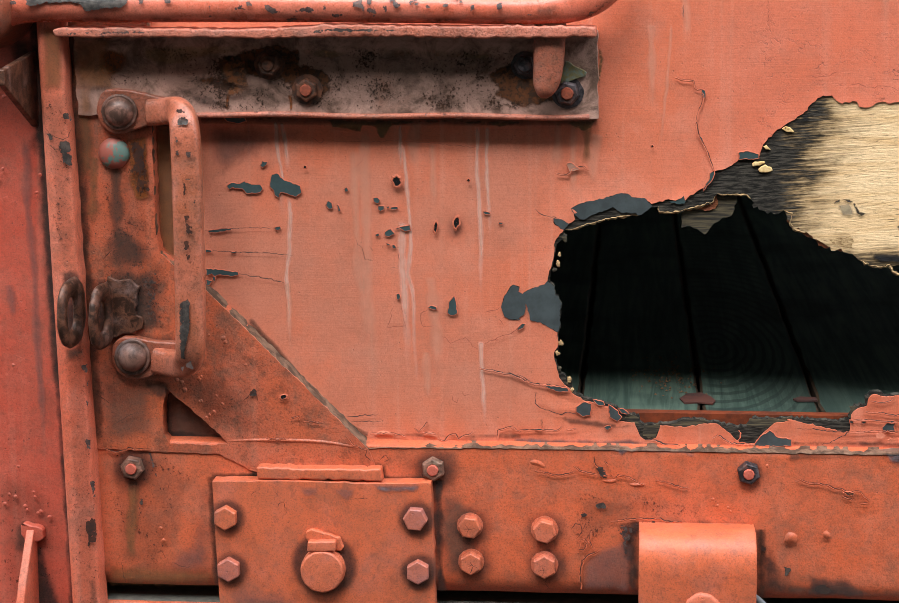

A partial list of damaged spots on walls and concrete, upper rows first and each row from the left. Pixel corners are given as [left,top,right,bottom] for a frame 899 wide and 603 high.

peeling [10,0,128,11]
peeling [265,4,397,33]
peeling [352,0,430,17]
corrosion [200,44,330,110]
corrosion [490,64,553,107]
peeling [738,150,759,160]
peeling [226,161,302,198]
peeling [553,193,652,230]
peeling [501,281,562,332]
peeling [575,399,629,430]
peeling [754,430,792,447]
peeling [876,420,899,452]